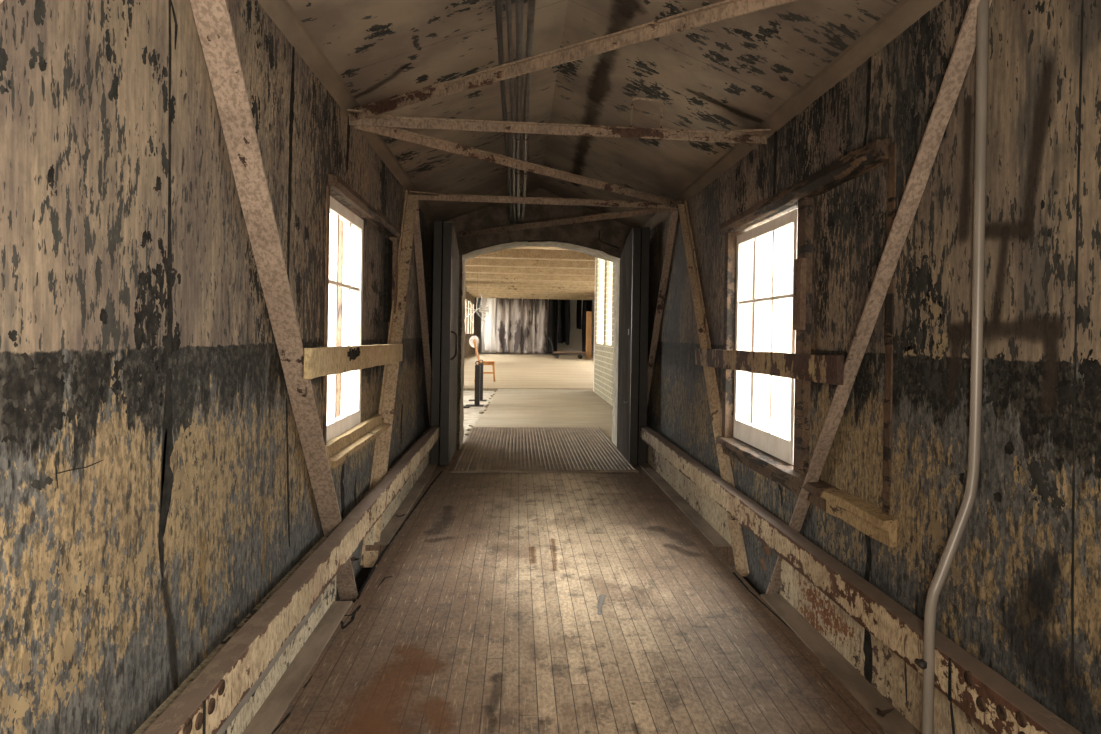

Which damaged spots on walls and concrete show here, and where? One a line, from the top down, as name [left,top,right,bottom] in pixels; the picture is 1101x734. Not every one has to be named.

peeling [0,48,12,94]
peeling [18,0,46,26]
peeling [29,46,48,72]
peeling [105,0,140,101]
peeling [142,46,176,123]
peeling [251,95,260,138]
peeling [400,0,528,86]
peeling [622,57,708,107]
peeling [702,21,794,103]
peeling [47,164,57,196]
peeling [148,123,169,192]
peeling [2,230,181,443]